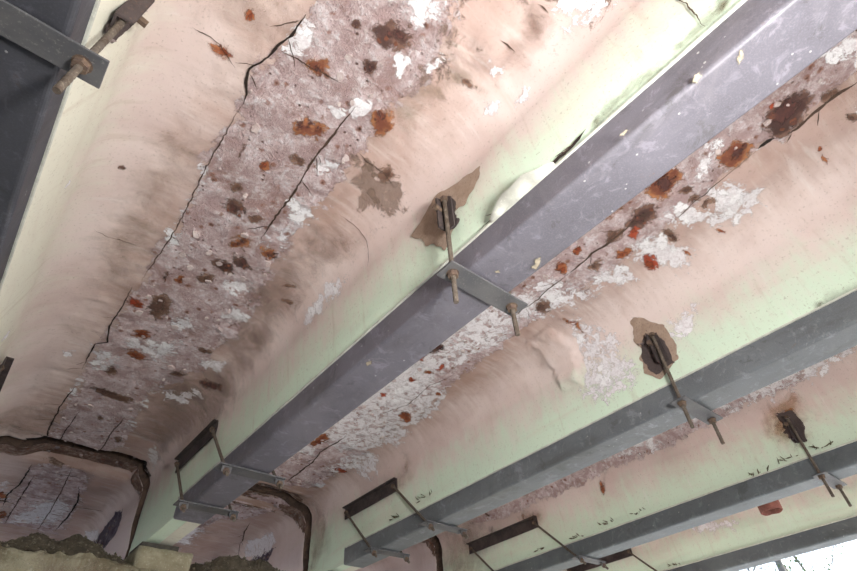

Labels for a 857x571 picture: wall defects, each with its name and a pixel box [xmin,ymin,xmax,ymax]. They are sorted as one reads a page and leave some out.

corrosion [372,19,413,52]
crack [553,129,586,163]
corrosion [715,140,755,168]
crack [675,82,857,221]
corrosion [762,88,838,139]
crack [40,15,355,440]
spalling [0,0,461,536]
spalling [176,30,857,550]
damp [299,138,768,482]
crack [516,211,650,319]
corrosion [605,166,715,259]
spalling [94,510,123,549]